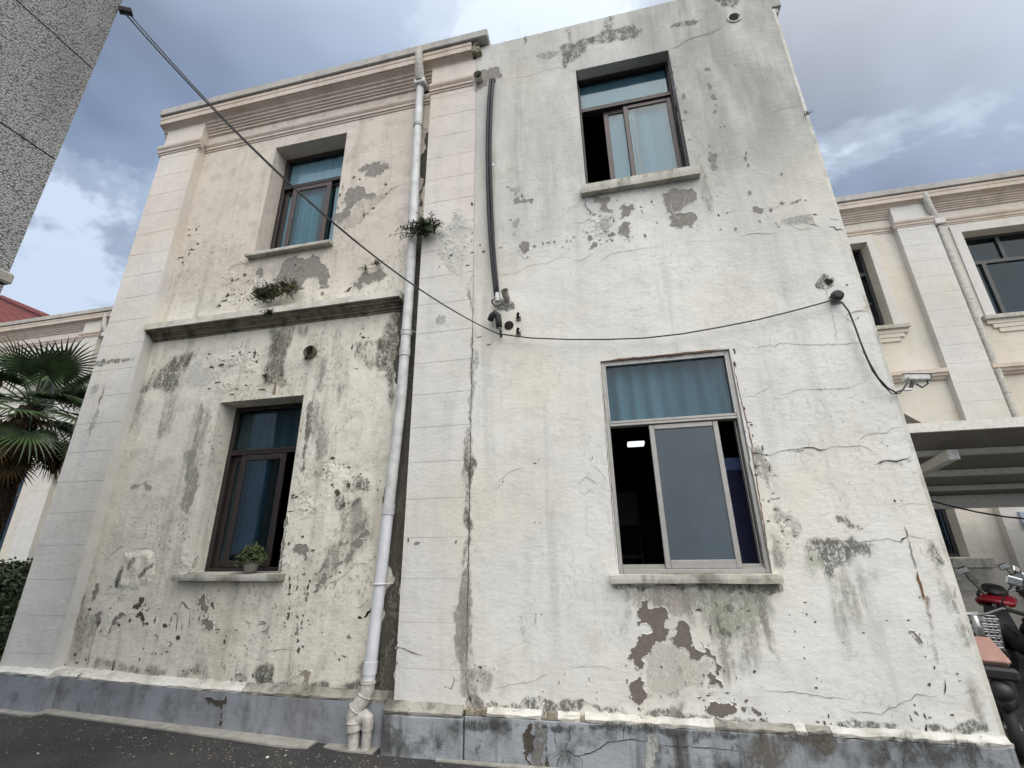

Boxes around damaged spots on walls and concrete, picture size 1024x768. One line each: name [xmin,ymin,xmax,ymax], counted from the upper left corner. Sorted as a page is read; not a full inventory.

peeling [333,161,397,227]
peeling [509,187,703,258]
peeling [276,253,330,300]
leakage [137,352,193,407]
leakage [181,404,208,513]
crack [763,427,908,464]
leakage [324,495,369,572]
leakage [807,516,872,577]
rust [904,526,930,616]
peeling [82,582,237,673]
peeling [620,599,768,721]
crack [549,727,748,766]